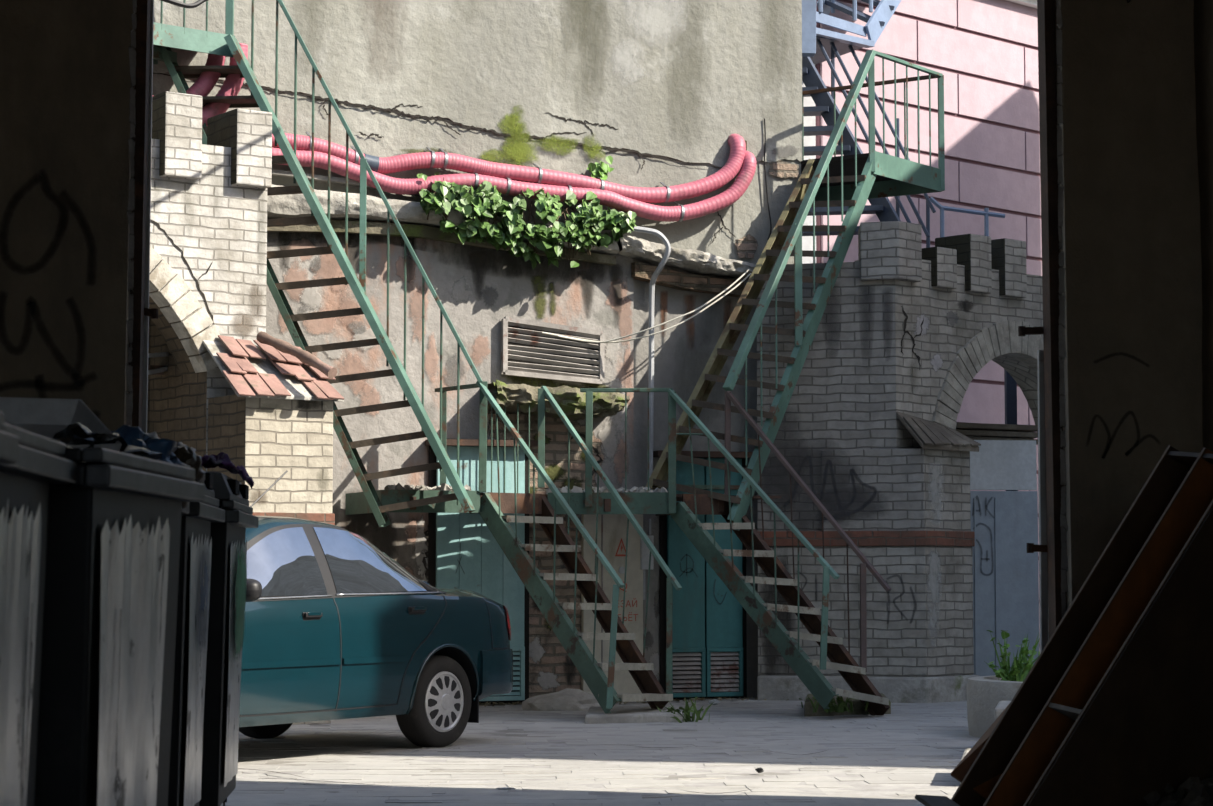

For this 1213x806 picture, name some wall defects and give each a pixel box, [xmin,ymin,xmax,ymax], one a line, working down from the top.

damp [628,0,680,39]
crack [217,81,717,170]
spalling [769,145,799,178]
crack [150,219,215,325]
peeling [284,240,381,415]
peeling [389,257,490,386]
damp [453,243,622,319]
spalling [735,234,758,258]
crack [901,306,924,371]
spalling [487,279,632,494]
spalling [346,513,429,583]
spalling [529,514,582,633]